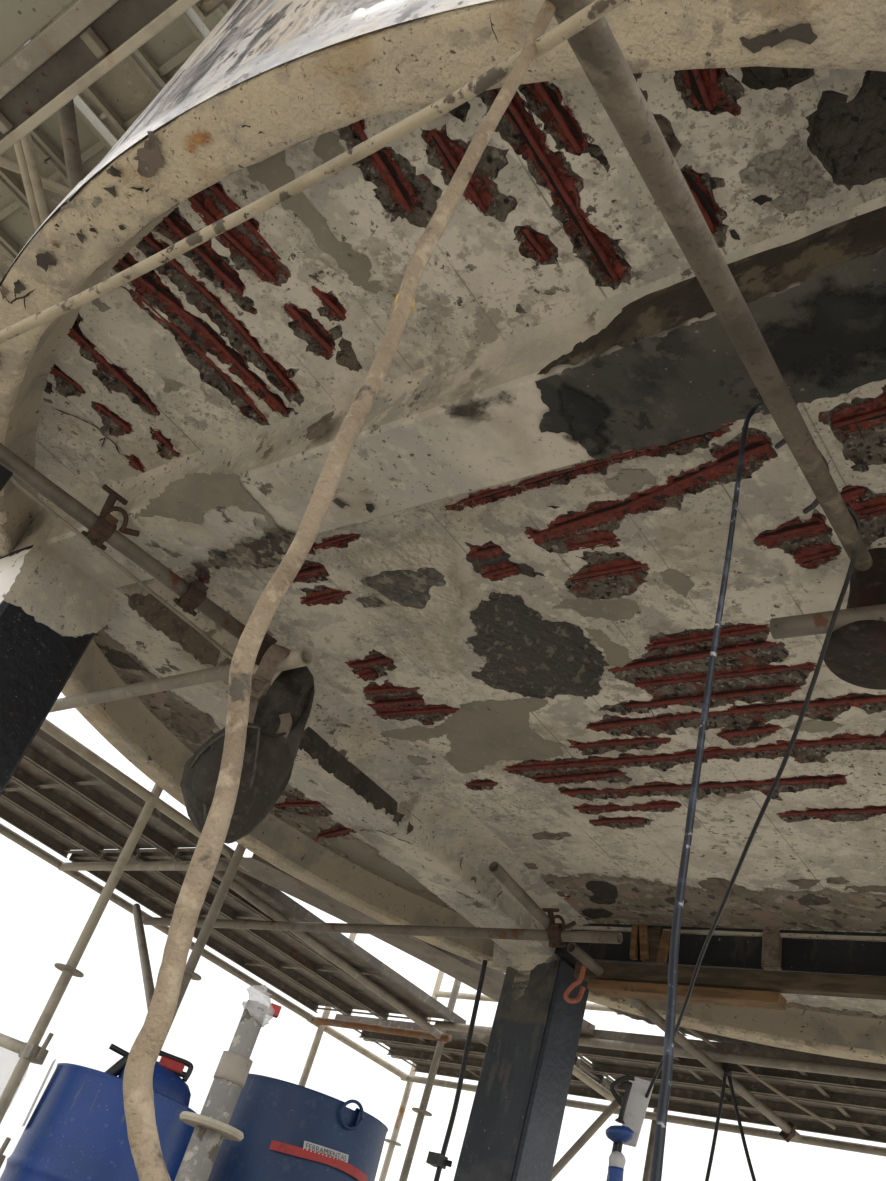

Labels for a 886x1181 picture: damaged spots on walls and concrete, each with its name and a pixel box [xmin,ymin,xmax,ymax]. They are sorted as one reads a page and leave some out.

spalling [352,87,502,228]
spalling [463,81,632,290]
spalling [673,23,818,117]
spalling [739,70,886,214]
spalling [112,182,304,426]
spalling [281,285,363,372]
leakage [558,384,611,454]
peeling [444,315,778,600]
leakage [537,276,715,375]
leakage [727,206,886,387]
spalling [782,351,886,548]
spalling [465,622,886,830]